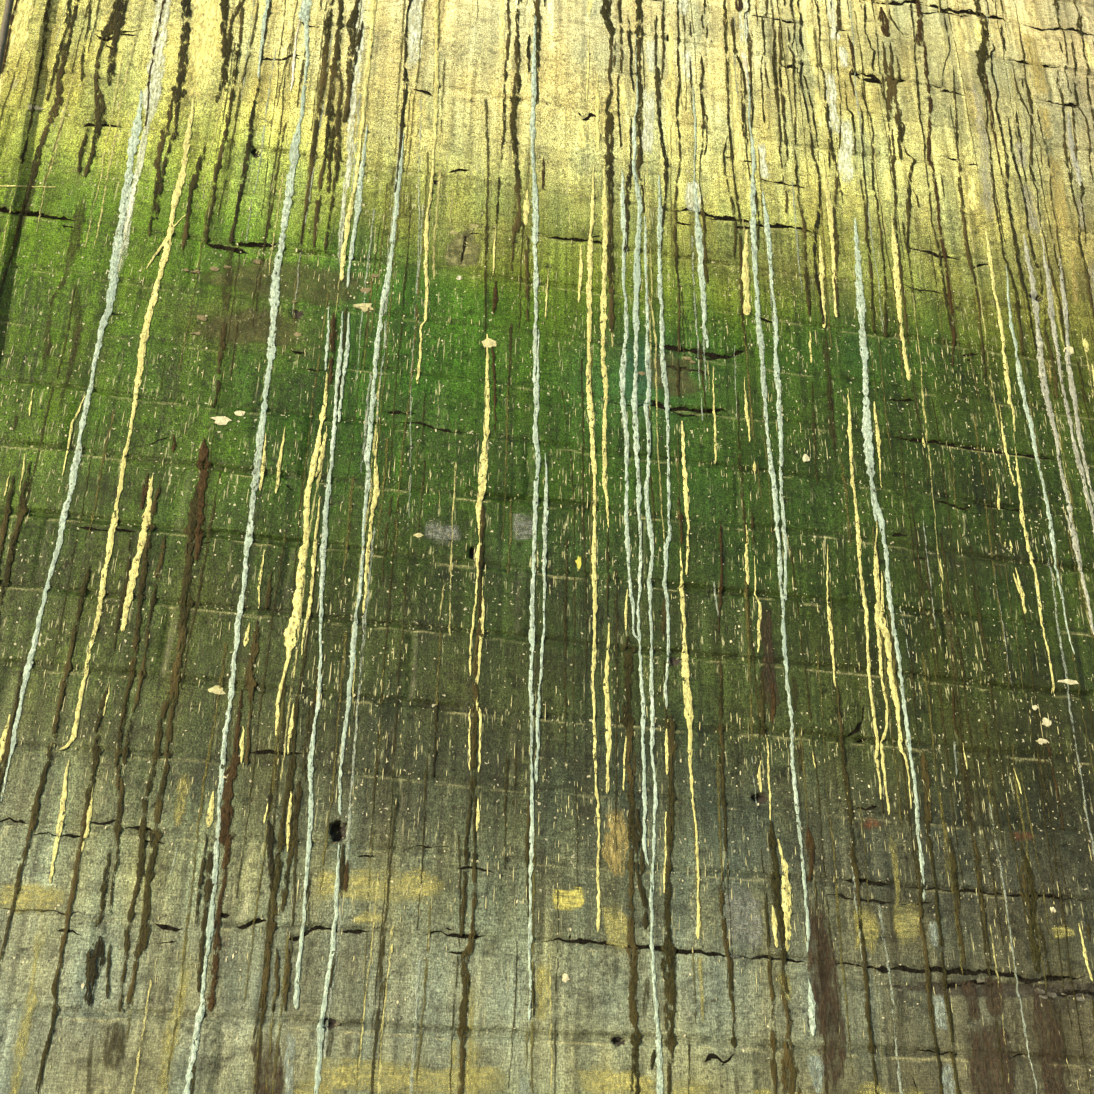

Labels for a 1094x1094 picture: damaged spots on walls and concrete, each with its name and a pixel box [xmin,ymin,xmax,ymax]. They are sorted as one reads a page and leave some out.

water stain [107,0,128,86]
water stain [188,0,244,102]
crack [0,0,614,1094]
water stain [299,0,364,254]
water stain [474,577,485,685]
water stain [529,16,539,443]
water stain [600,166,638,638]
water stain [754,190,788,600]
crack [508,0,1094,1094]
water stain [878,7,905,159]
water stain [985,228,1016,432]
water stain [990,43,1059,399]